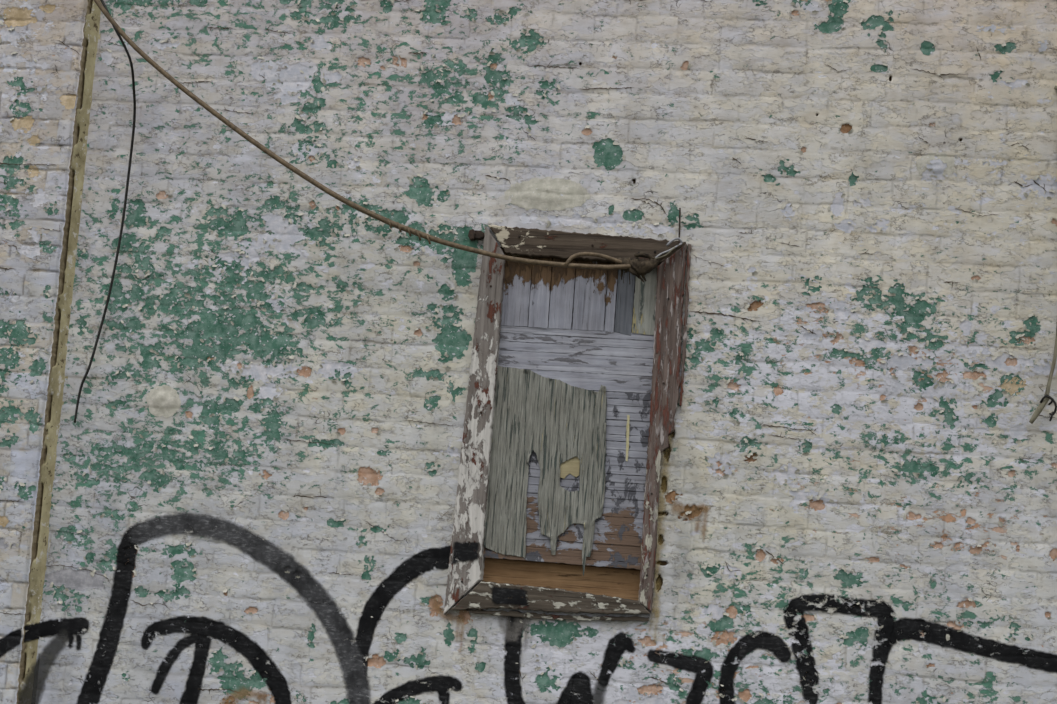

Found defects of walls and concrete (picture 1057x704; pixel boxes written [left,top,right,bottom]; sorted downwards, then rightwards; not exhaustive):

peeling [415,0,530,27]
peeling [244,57,361,173]
peeling [418,29,544,133]
peeling [0,155,59,259]
peeling [404,173,450,207]
peeling [0,285,53,393]
peeling [55,195,479,493]
peeling [797,275,1057,430]
peeling [56,527,203,603]
peeling [209,647,276,704]
peeling [363,633,430,670]
spalling [419,594,486,673]